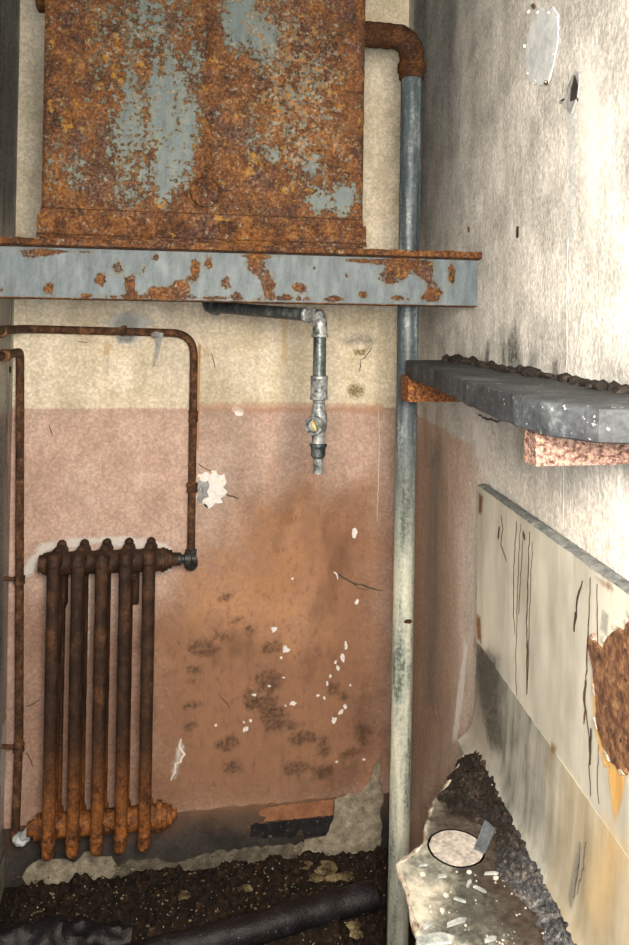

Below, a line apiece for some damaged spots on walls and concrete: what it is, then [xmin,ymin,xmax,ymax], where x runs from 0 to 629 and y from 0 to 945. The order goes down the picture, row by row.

peeling [523,3,559,86]
spalling [196,463,239,509]